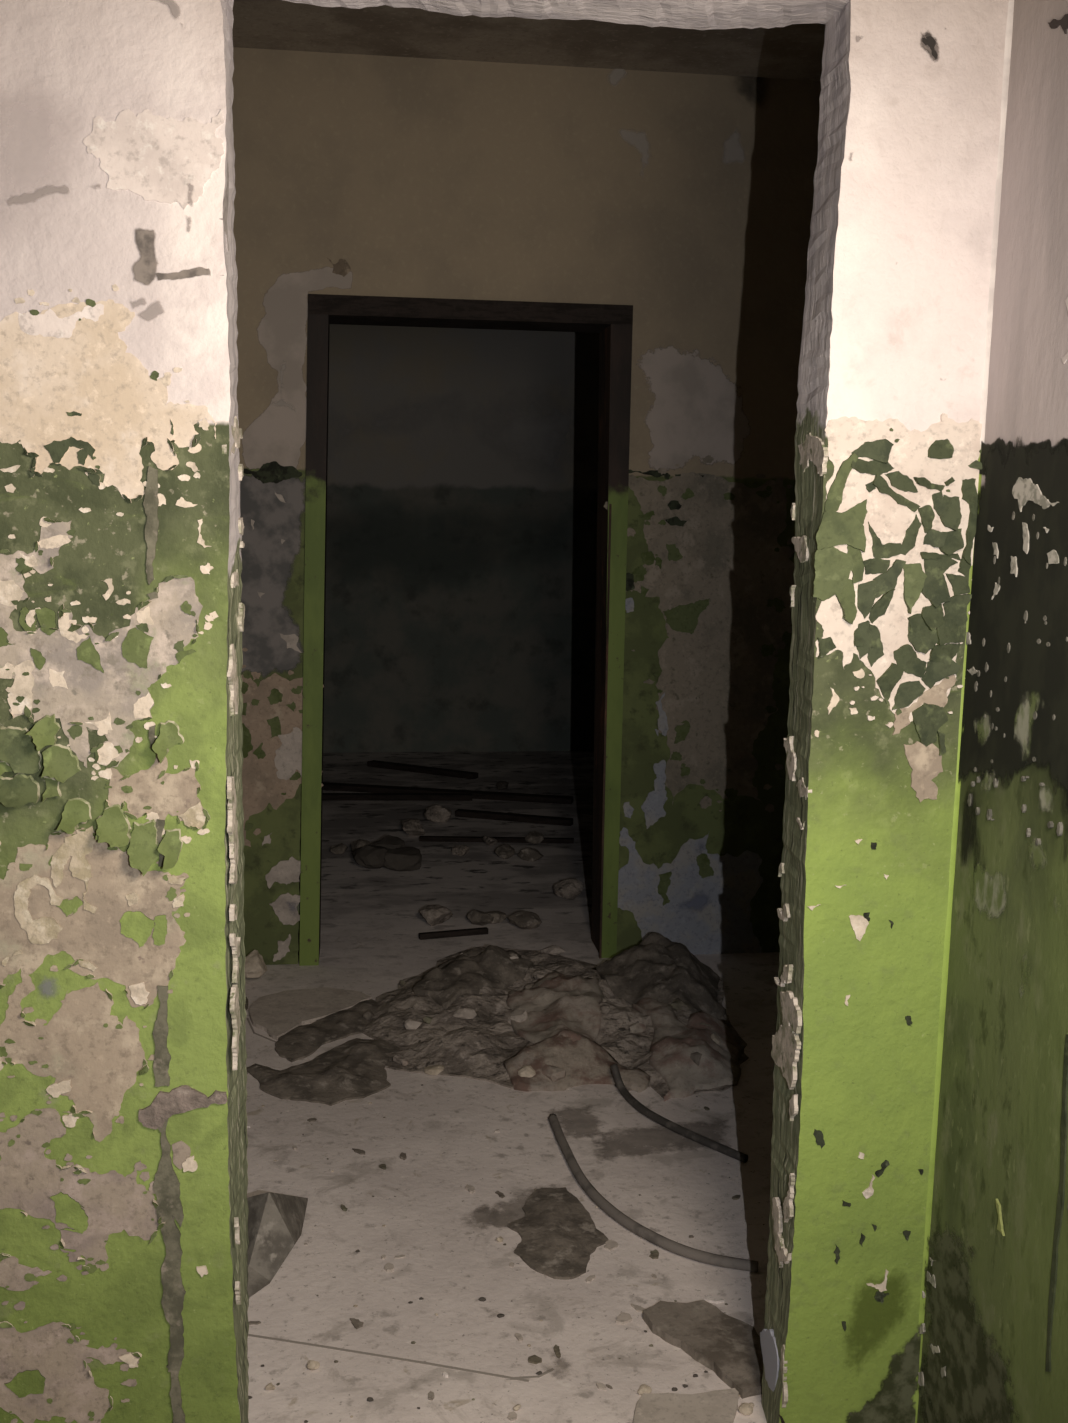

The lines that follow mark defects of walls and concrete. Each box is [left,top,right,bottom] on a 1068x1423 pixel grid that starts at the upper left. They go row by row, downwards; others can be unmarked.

spalling [238,518,255,548]
peeling [227,569,303,884]
peeling [618,413,1068,955]
peeling [0,284,244,1423]
peeling [265,856,301,962]
spalling [771,964,802,1121]
spalling [772,1173,795,1268]